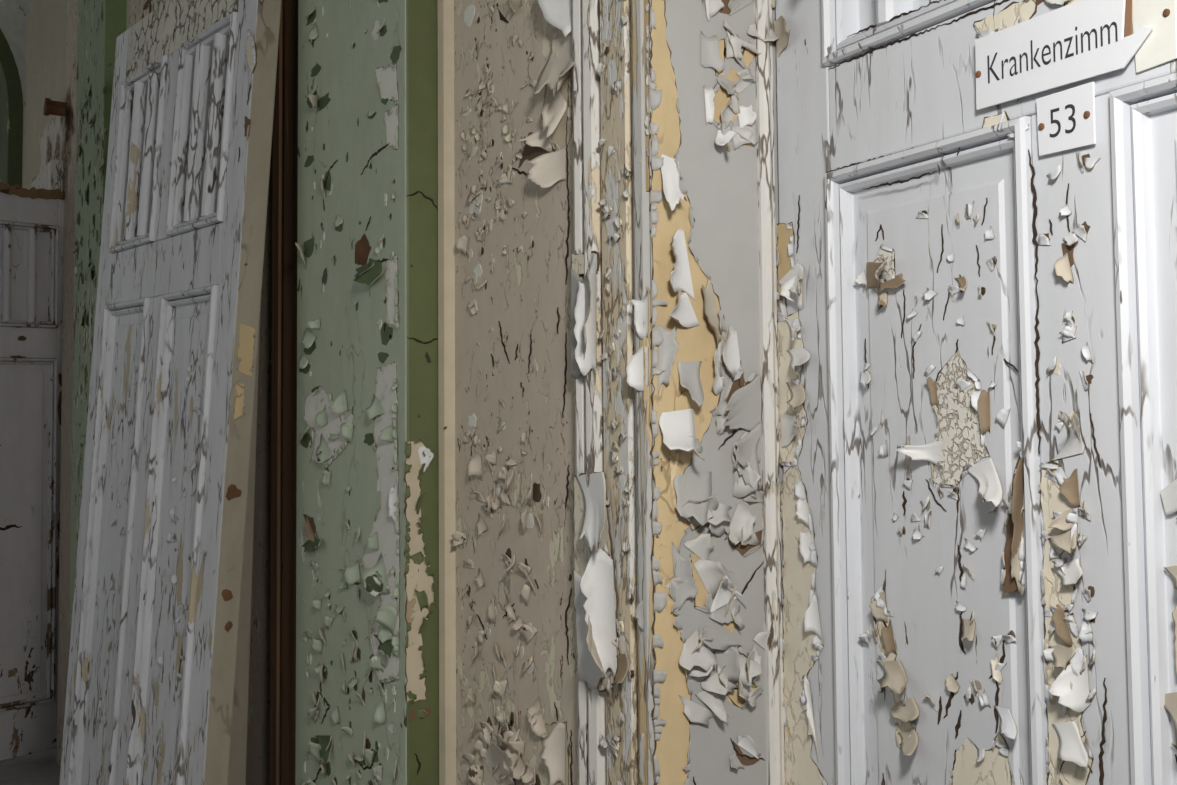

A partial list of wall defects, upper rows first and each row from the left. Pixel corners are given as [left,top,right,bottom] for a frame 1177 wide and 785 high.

peeling [973,23,1000,39]
peeling [38,76,107,288]
peeling [456,0,576,315]
peeling [77,305,94,329]
peeling [571,0,828,785]
peeling [451,413,527,587]
peeling [521,473,549,537]
peeling [1163,566,1177,589]
peeling [1164,692,1177,762]